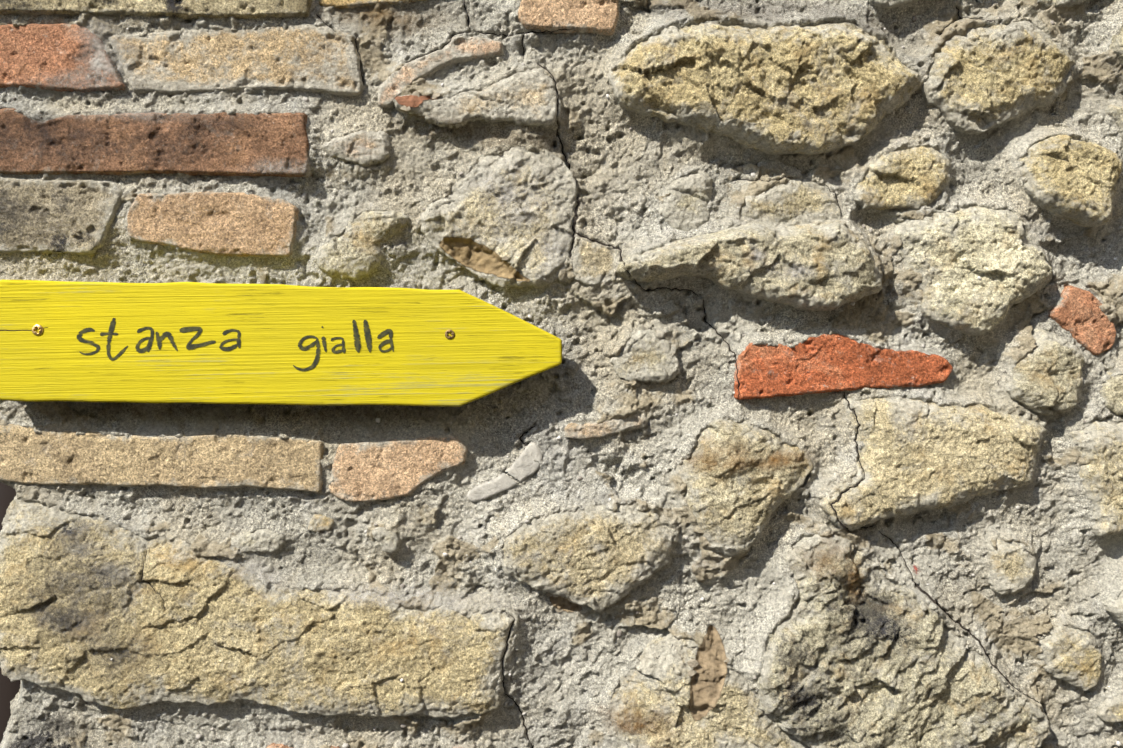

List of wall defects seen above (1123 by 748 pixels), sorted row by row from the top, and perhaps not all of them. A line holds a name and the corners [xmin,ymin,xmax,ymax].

crack [405,0,571,170]
crack [570,196,740,395]
crack [830,393,1049,720]
crack [502,611,533,748]